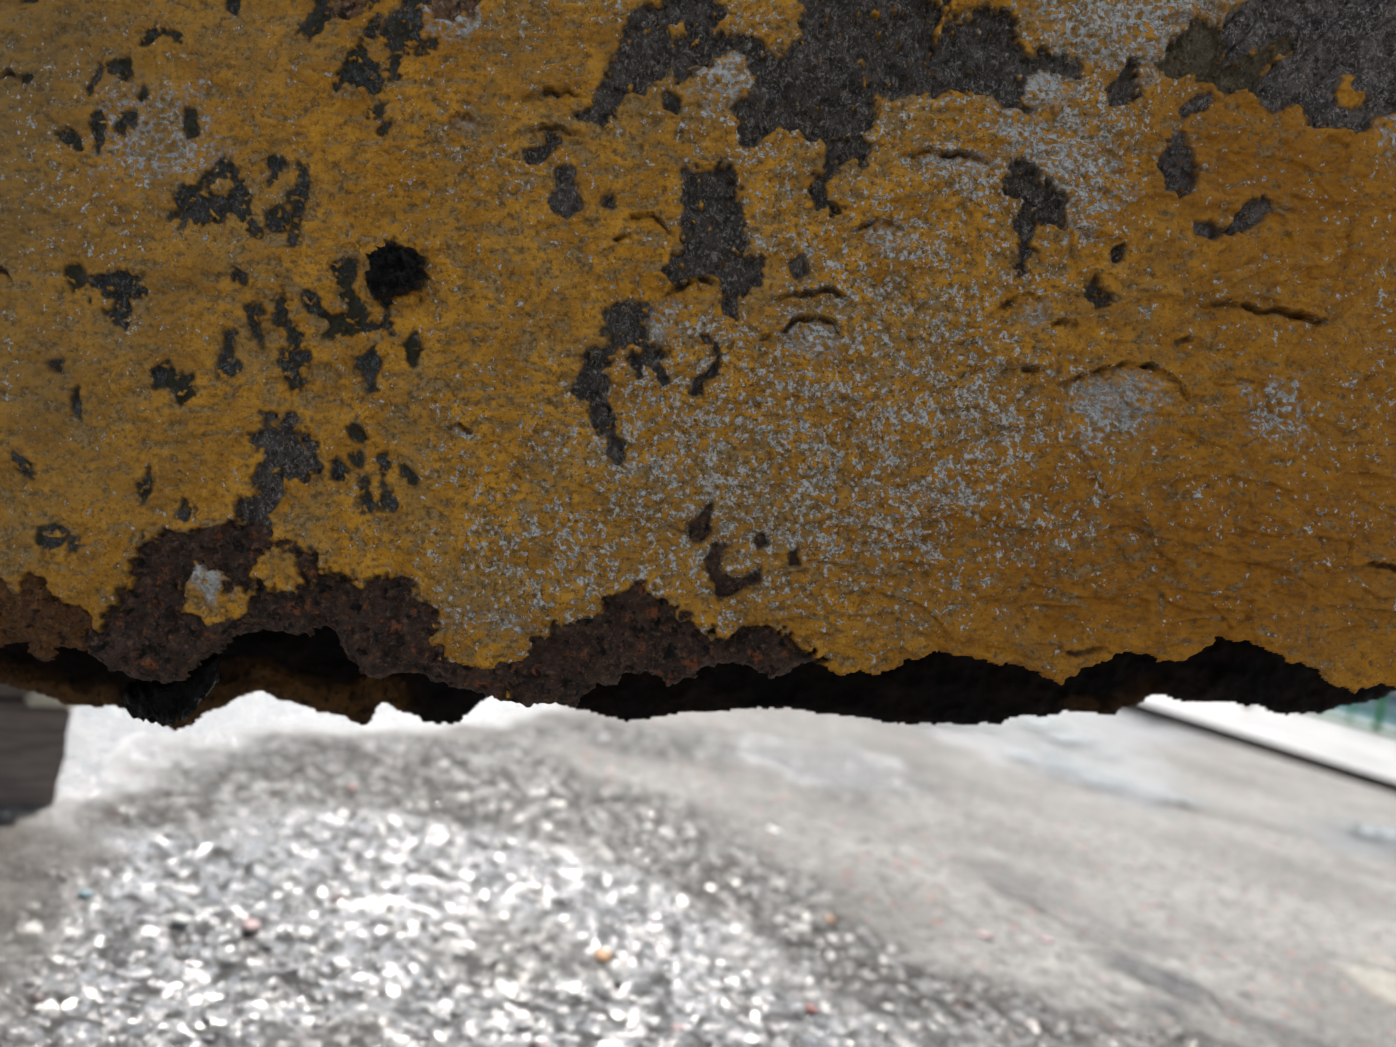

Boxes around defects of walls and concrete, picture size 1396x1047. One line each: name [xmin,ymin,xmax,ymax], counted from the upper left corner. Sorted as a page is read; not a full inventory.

peeling [295,0,480,136]
peeling [575,0,1082,217]
peeling [1217,0,1396,133]
peeling [151,360,196,405]
peeling [168,154,309,247]
peeling [215,238,430,394]
peeling [571,161,765,467]
peeling [789,255,809,279]
peeling [1002,160,1068,277]
peeling [35,523,80,552]
peeling [235,412,418,530]
rust [0,502,828,731]